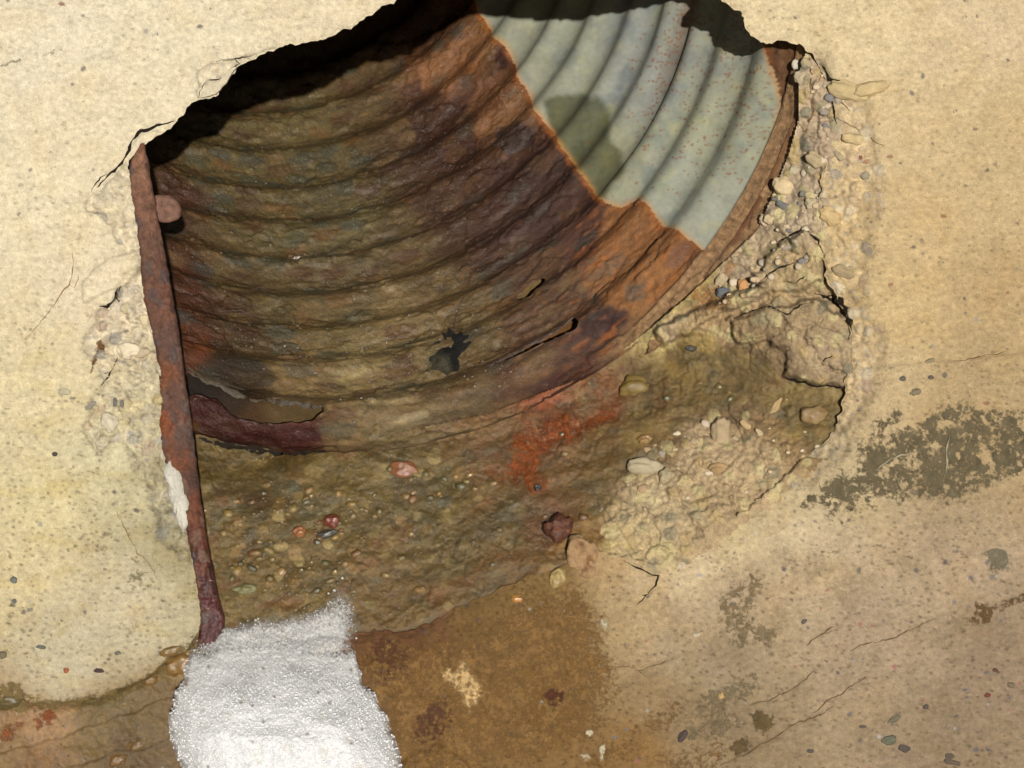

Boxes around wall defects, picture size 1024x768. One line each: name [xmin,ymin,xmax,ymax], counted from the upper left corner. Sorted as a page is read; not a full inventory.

crack [199,56,249,95]
spalling [194,48,273,102]
crack [91,121,174,191]
spalling [85,164,140,254]
rust [145,0,815,495]
crack [728,229,853,331]
spalling [763,54,889,486]
spalling [81,271,190,560]
crack [785,356,845,389]
water stain [800,404,1024,524]
water stain [442,662,481,712]